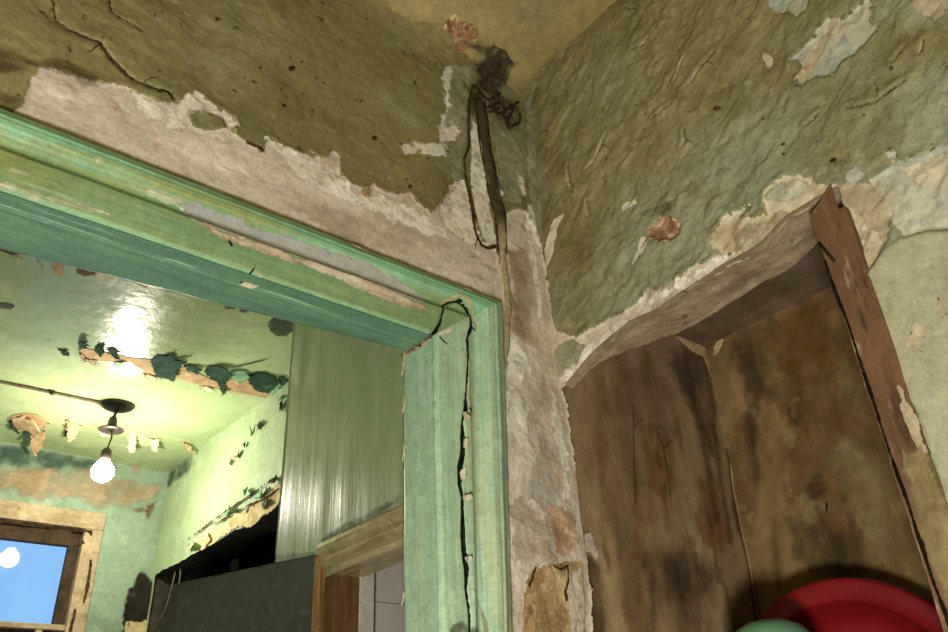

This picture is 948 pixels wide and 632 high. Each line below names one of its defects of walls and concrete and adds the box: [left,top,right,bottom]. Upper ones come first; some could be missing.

crack [51,0,174,99]
leakage [470,45,518,123]
peeling [789,0,880,86]
peeling [13,64,505,353]
peeling [57,341,288,413]
peeling [491,94,948,632]
leakage [737,345,766,398]
peeling [8,413,50,457]
peeling [127,431,162,453]
crack [401,294,477,632]
peeling [187,475,281,550]
leakage [591,603,604,632]